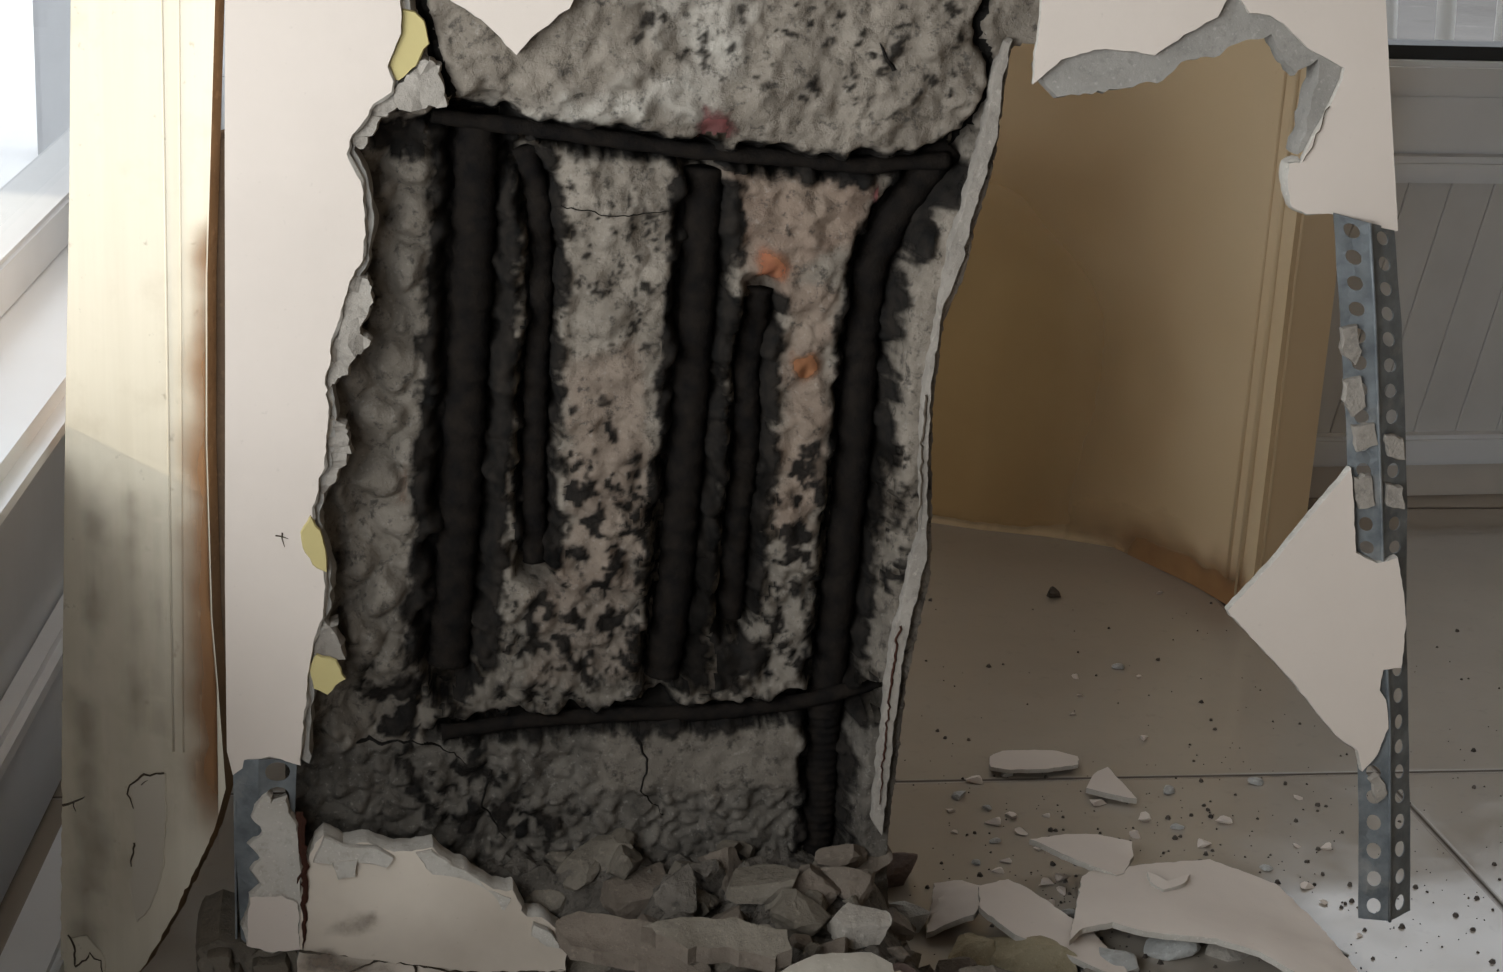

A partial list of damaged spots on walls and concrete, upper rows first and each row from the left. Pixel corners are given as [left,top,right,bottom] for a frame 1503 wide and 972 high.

spalling [285,0,1342,911]
crack [62,796,85,812]
crack [126,772,164,867]
crack [67,934,103,972]